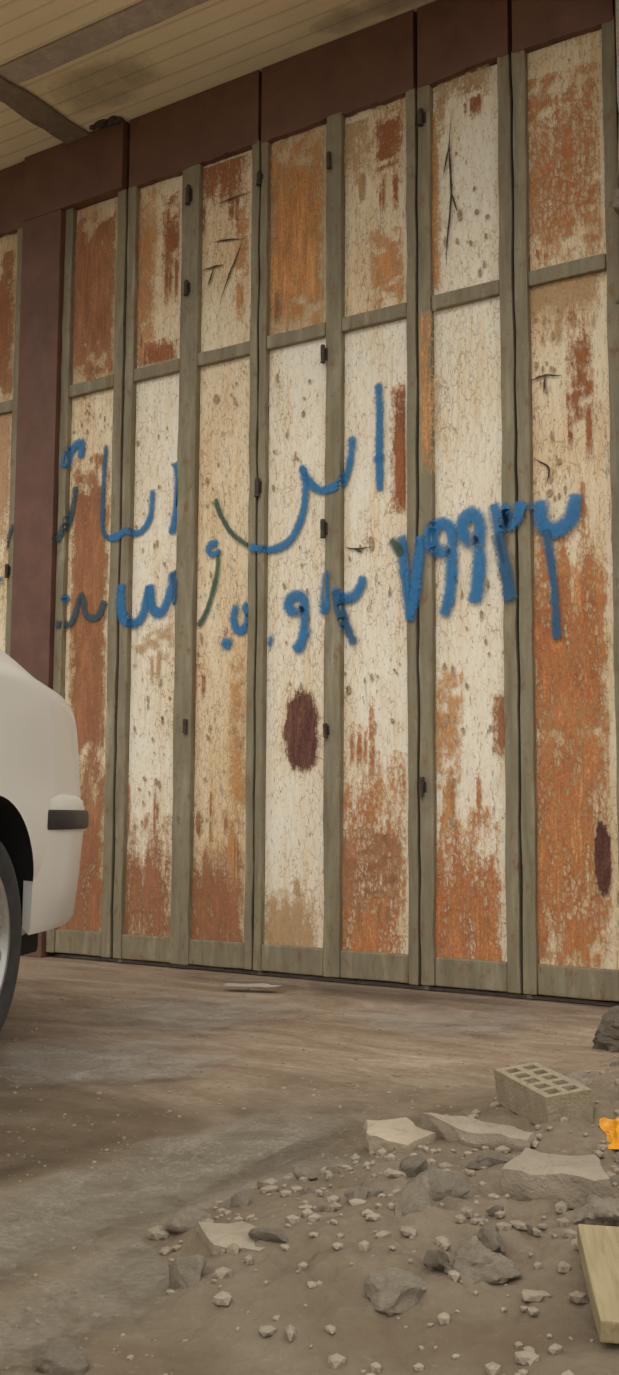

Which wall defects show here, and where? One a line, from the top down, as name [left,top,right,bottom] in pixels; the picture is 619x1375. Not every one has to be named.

corrosion [136,189,180,366]
corrosion [269,130,323,335]
corrosion [344,98,403,308]
corrosion [527,62,602,458]
corrosion [58,452,110,932]
corrosion [124,783,172,937]
corrosion [191,645,247,943]
corrosion [282,688,319,773]
corrosion [342,696,406,954]
corrosion [435,663,502,961]
corrosion [492,694,505,756]
corrosion [533,477,613,967]